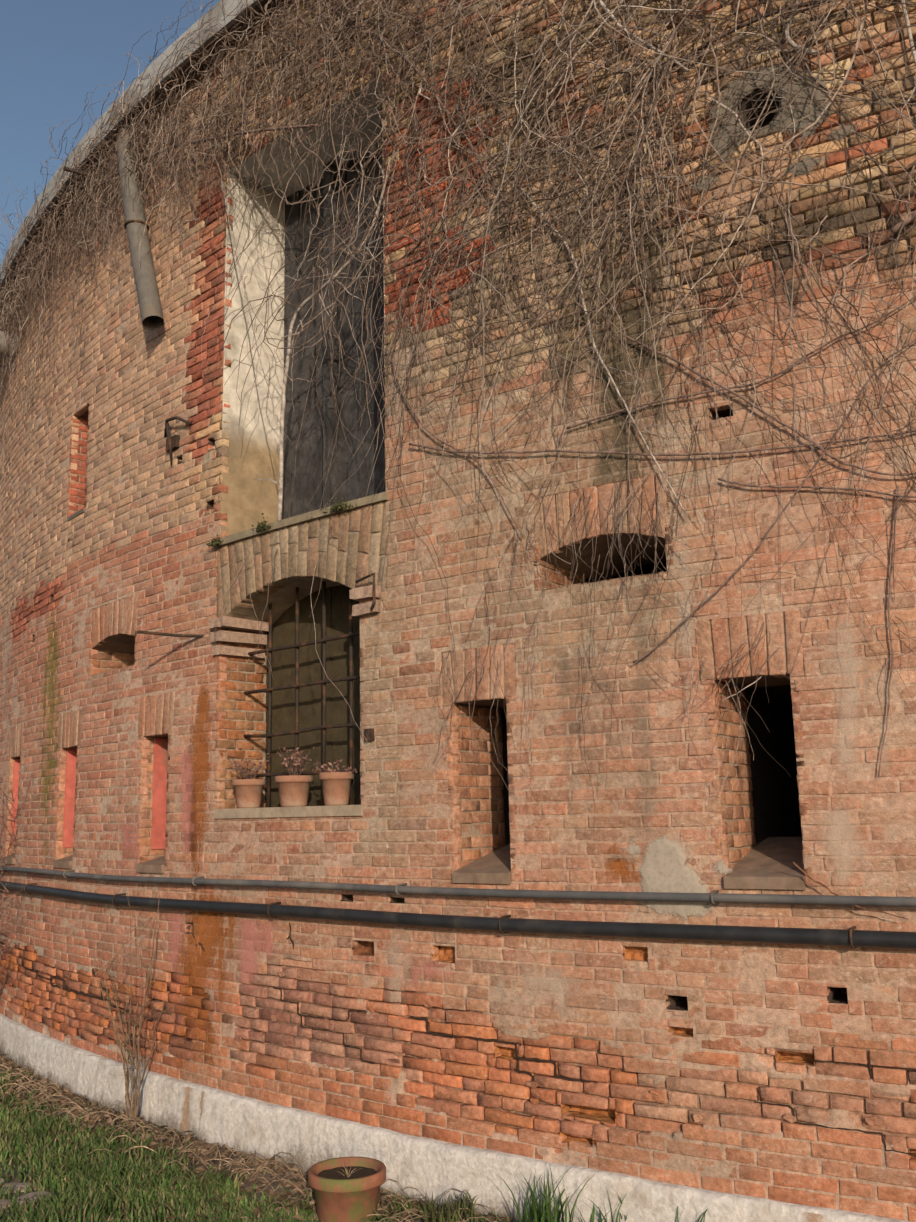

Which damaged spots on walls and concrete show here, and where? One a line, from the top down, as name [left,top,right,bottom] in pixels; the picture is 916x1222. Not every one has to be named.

leakage [560,225,661,468]
crack [408,1016,598,1083]
crack [811,1060,916,1085]
crack [756,1088,916,1155]